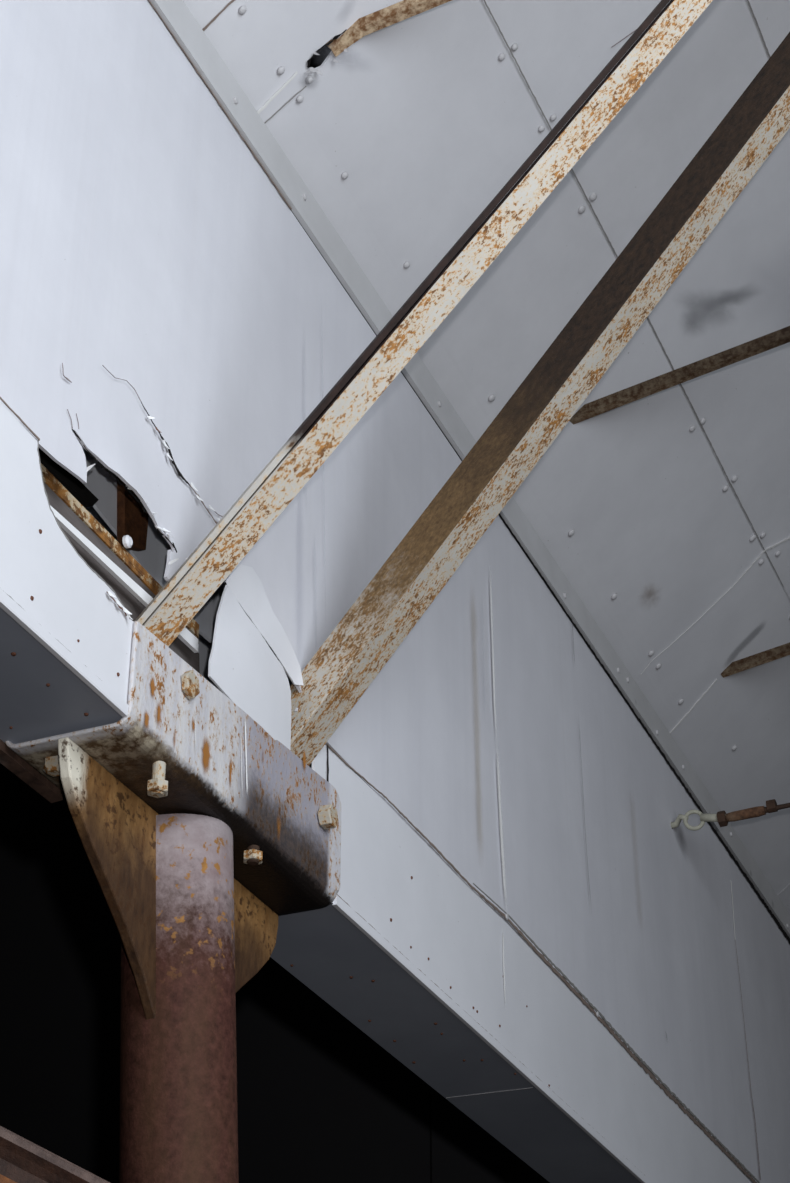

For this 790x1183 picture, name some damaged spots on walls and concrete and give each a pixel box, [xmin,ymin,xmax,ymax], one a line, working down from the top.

corrosion [145,678,161,726]
corrosion [203,741,211,769]